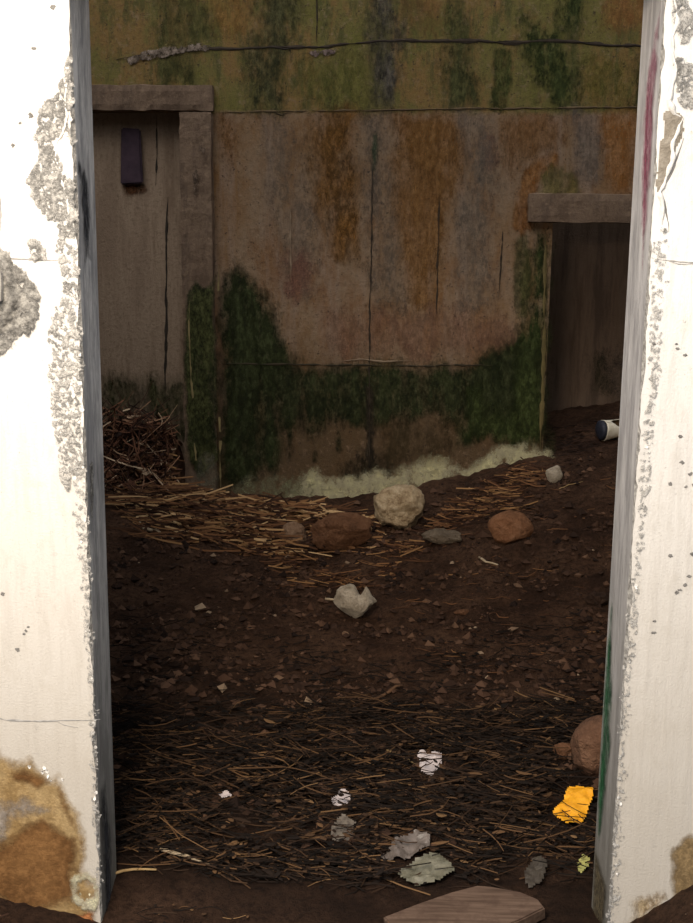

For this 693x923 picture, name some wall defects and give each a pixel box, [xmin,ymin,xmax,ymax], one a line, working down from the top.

rust [302,104,360,262]
water stain [361,0,404,215]
crack [660,258,693,266]
peeling [0,54,105,887]
water stain [234,335,554,499]
spalling [605,0,693,923]
crack [0,718,98,727]